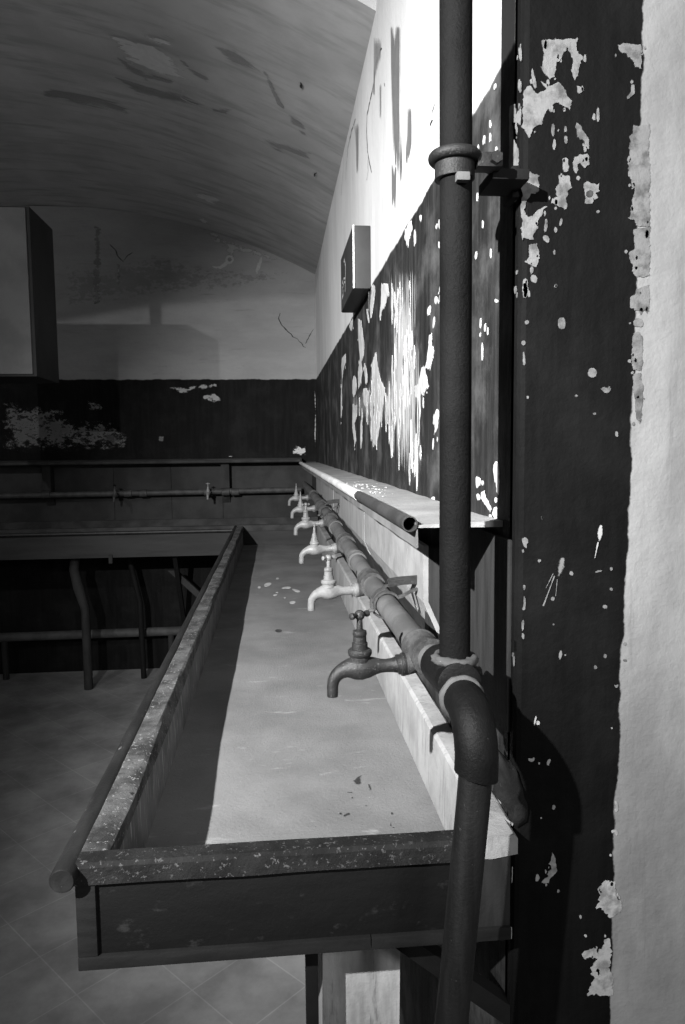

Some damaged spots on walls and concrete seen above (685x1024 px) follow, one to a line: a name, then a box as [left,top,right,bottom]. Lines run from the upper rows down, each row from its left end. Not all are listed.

peeling [615,43,646,69]
leakage [373,27,411,202]
peeling [477,38,600,298]
peeling [624,124,651,426]
peeling [171,384,220,401]
peeling [341,274,440,491]
peeling [476,461,500,519]
peeling [596,880,622,918]
peeling [582,934,614,996]